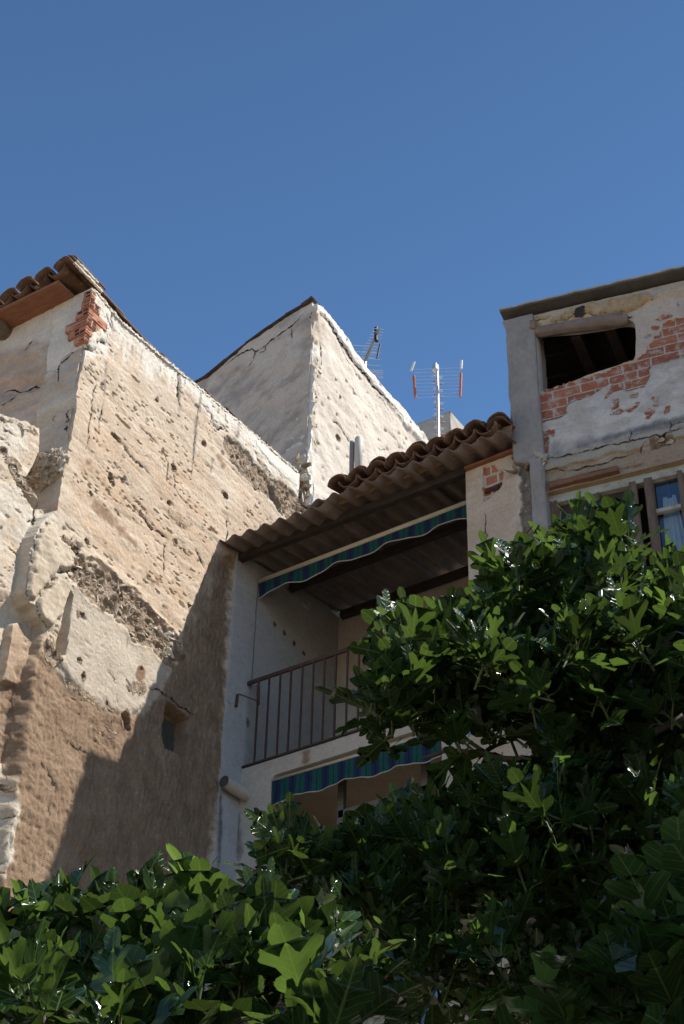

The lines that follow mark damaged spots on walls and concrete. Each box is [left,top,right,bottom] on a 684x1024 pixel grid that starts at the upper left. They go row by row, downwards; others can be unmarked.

spalling [65,289,108,351]
spalling [0,416,37,435]
spalling [5,454,37,499]
crack [2,314,228,503]
spalling [223,435,300,519]
crack [229,313,404,451]
spalling [482,465,504,500]
spalling [540,314,684,453]
crack [545,423,683,472]
spalling [22,521,181,712]